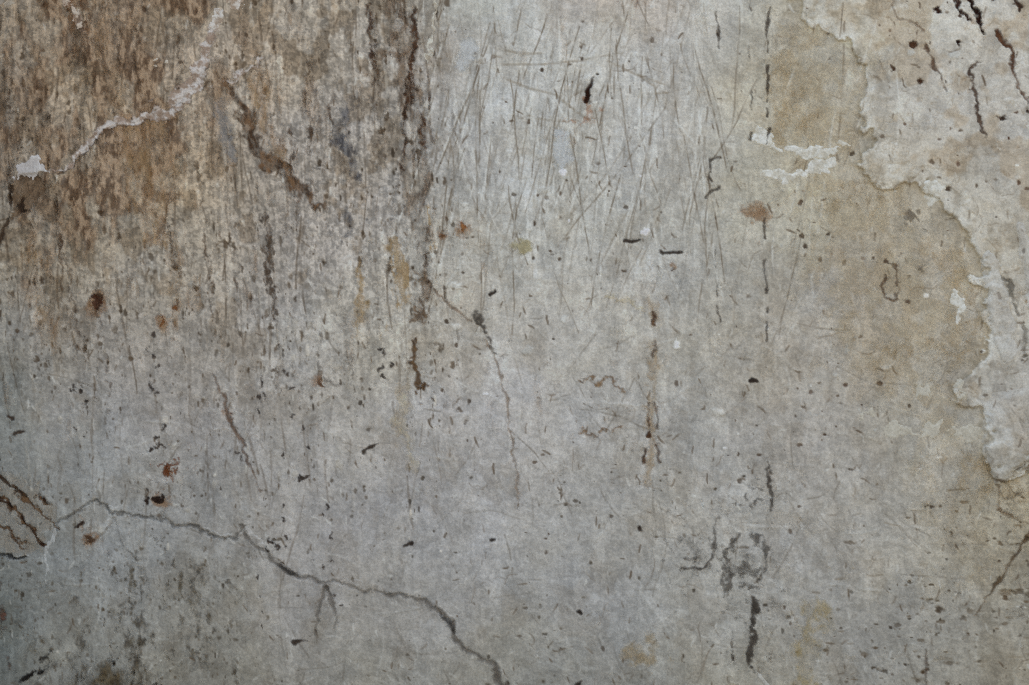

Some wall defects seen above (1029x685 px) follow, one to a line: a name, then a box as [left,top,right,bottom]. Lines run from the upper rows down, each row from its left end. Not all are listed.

crack [0,185,12,244]
leakage [40,0,183,245]
crack [52,27,263,175]
leakage [213,79,324,211]
leakage [387,0,432,170]
flaking render [749,125,851,185]
flaking render [923,180,946,206]
crack [921,0,1026,135]
flaking render [949,288,967,325]
leakage [408,337,429,394]
flaking render [883,415,983,443]
crack [426,601,508,685]